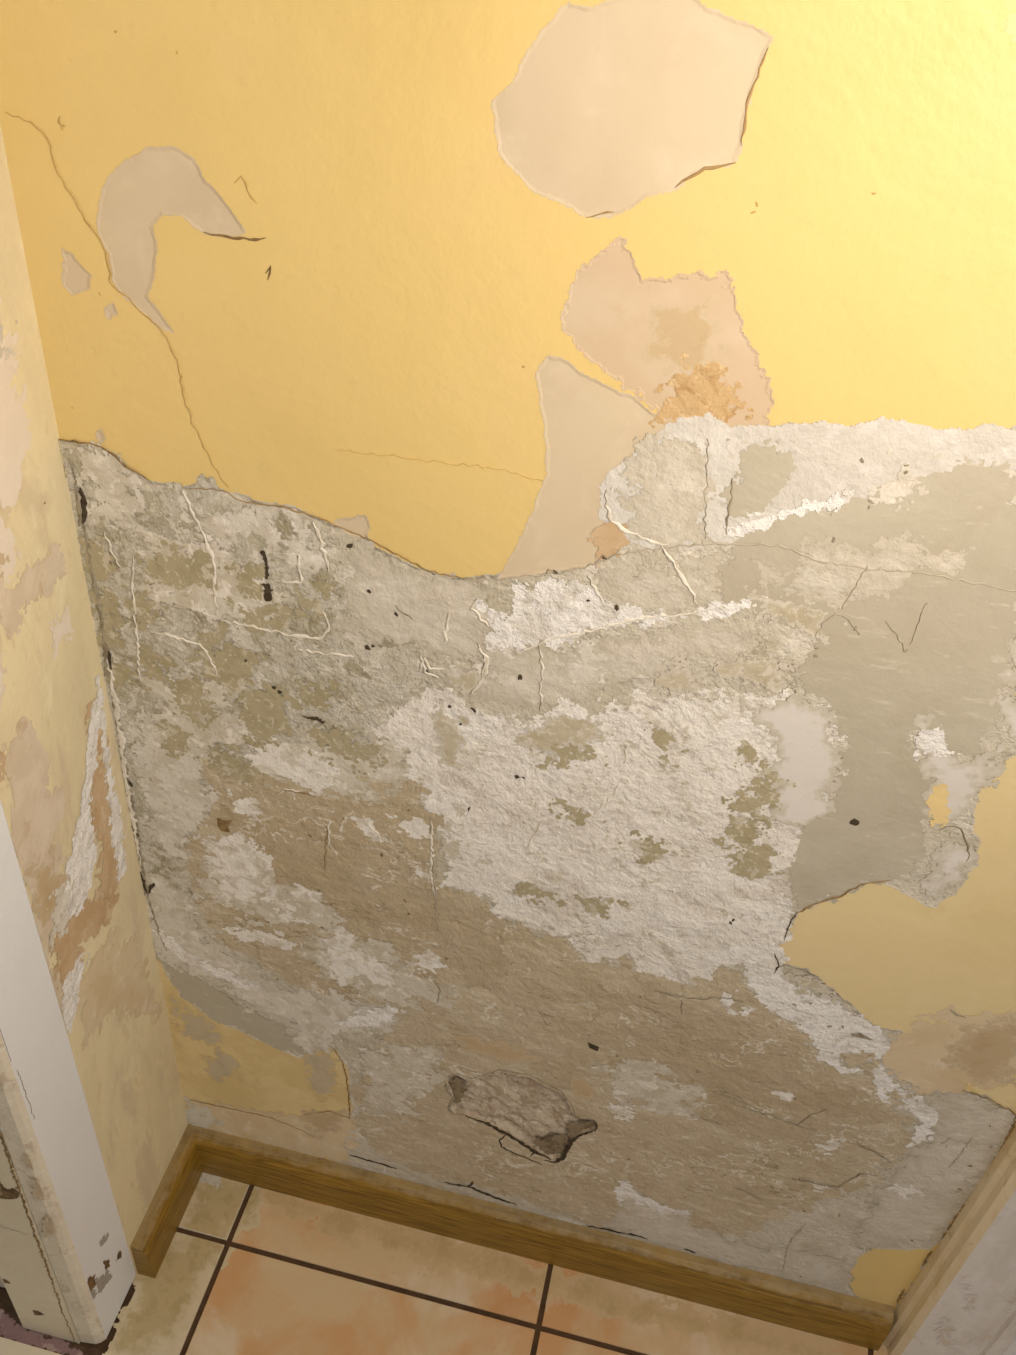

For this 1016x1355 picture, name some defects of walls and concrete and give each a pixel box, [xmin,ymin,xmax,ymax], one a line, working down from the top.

peeling [0,330,67,640]
peeling [61,145,266,333]
crack [6,112,1016,651]
peeling [491,0,774,219]
peeling [0,1309,83,1355]
spalling [87,1233,122,1300]
crack [58,439,177,971]
crack [284,790,328,869]
peeling [0,717,717,1261]
leakage [25,533,1016,1241]
flaking render [718,963,1015,1298]
crack [939,826,970,862]